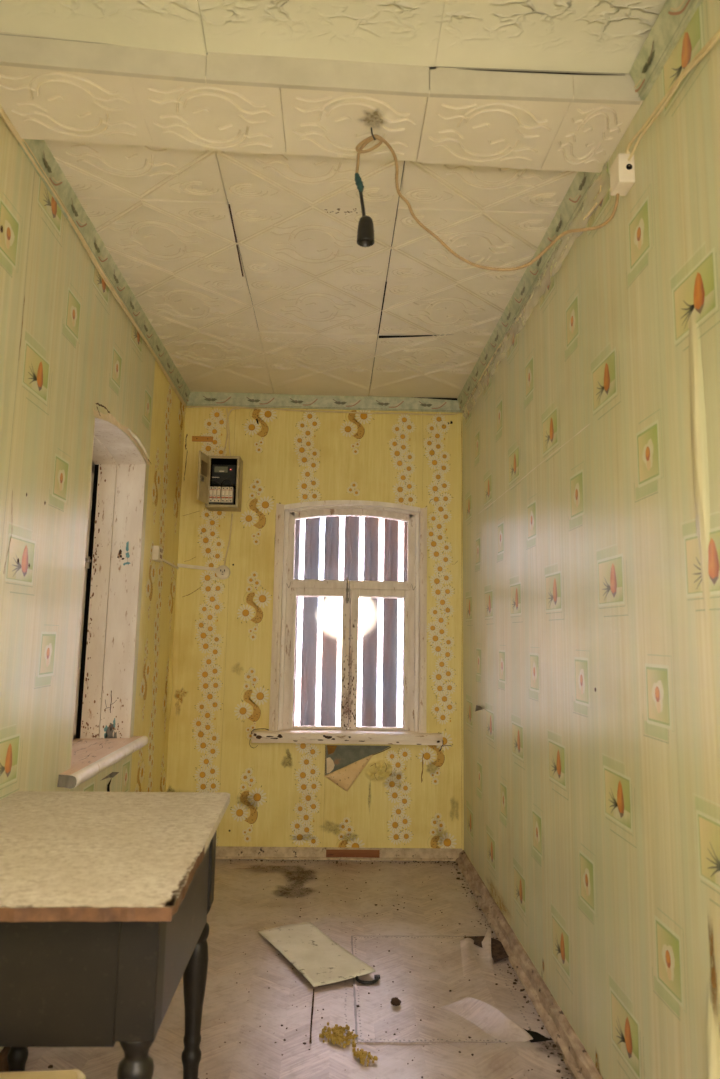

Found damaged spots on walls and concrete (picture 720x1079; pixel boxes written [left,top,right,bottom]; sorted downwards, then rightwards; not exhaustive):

flaking render [319,614,399,775]